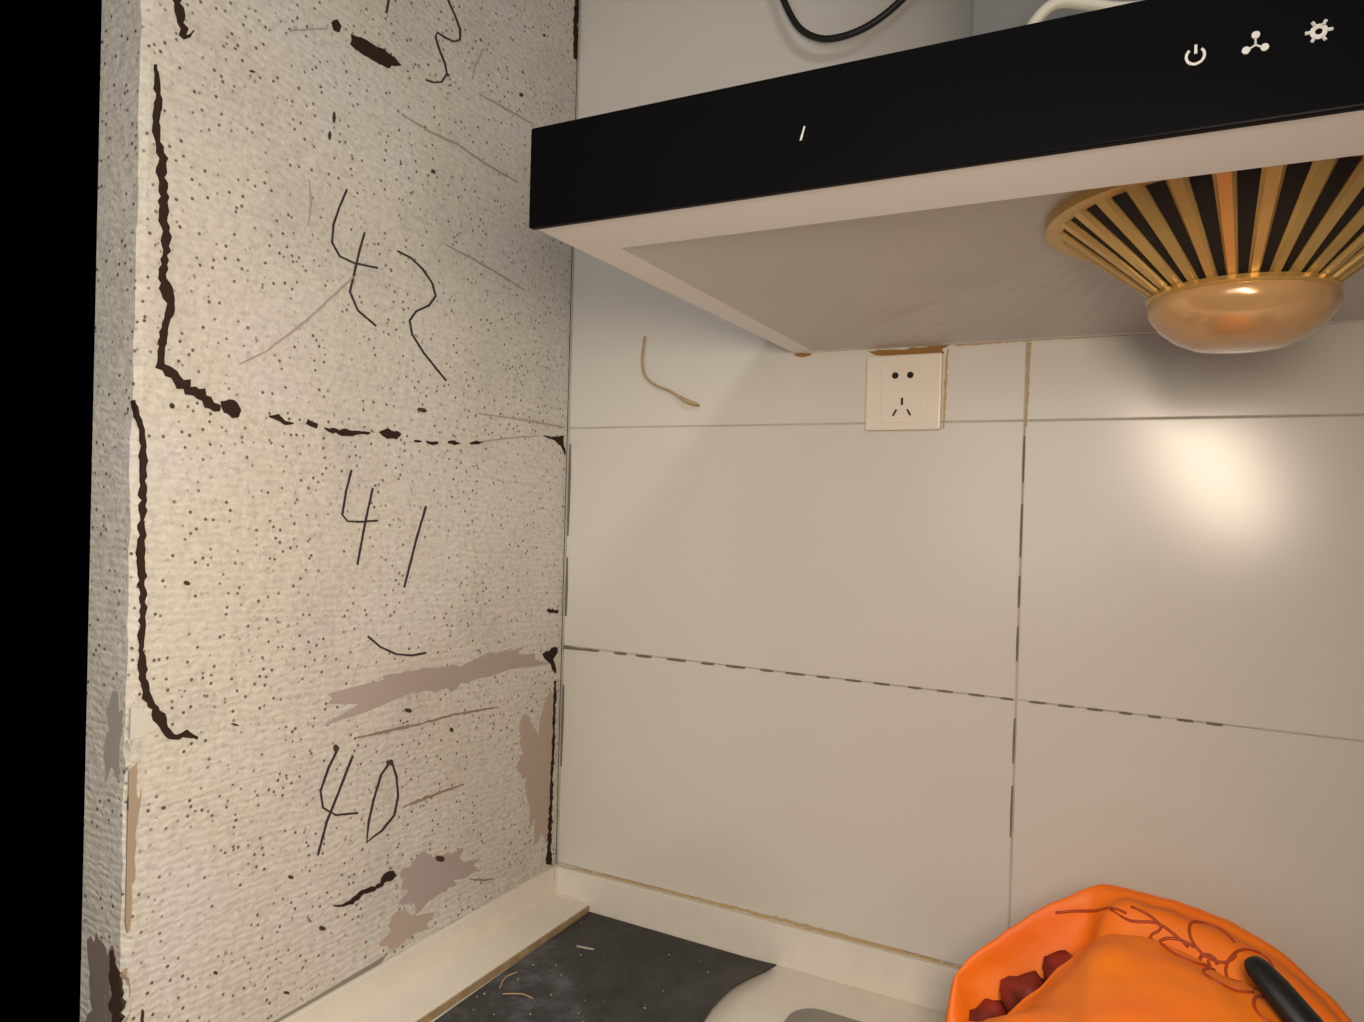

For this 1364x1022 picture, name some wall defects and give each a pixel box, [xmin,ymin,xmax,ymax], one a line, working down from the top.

crack [173,0,195,40]
crack [572,0,580,59]
crack [401,114,518,183]
crack [305,180,313,226]
crack [152,64,221,412]
crack [445,244,525,290]
crack [239,274,357,364]
crack [269,414,370,436]
crack [130,400,198,740]
crack [333,871,397,907]
spalling [85,932,116,1022]